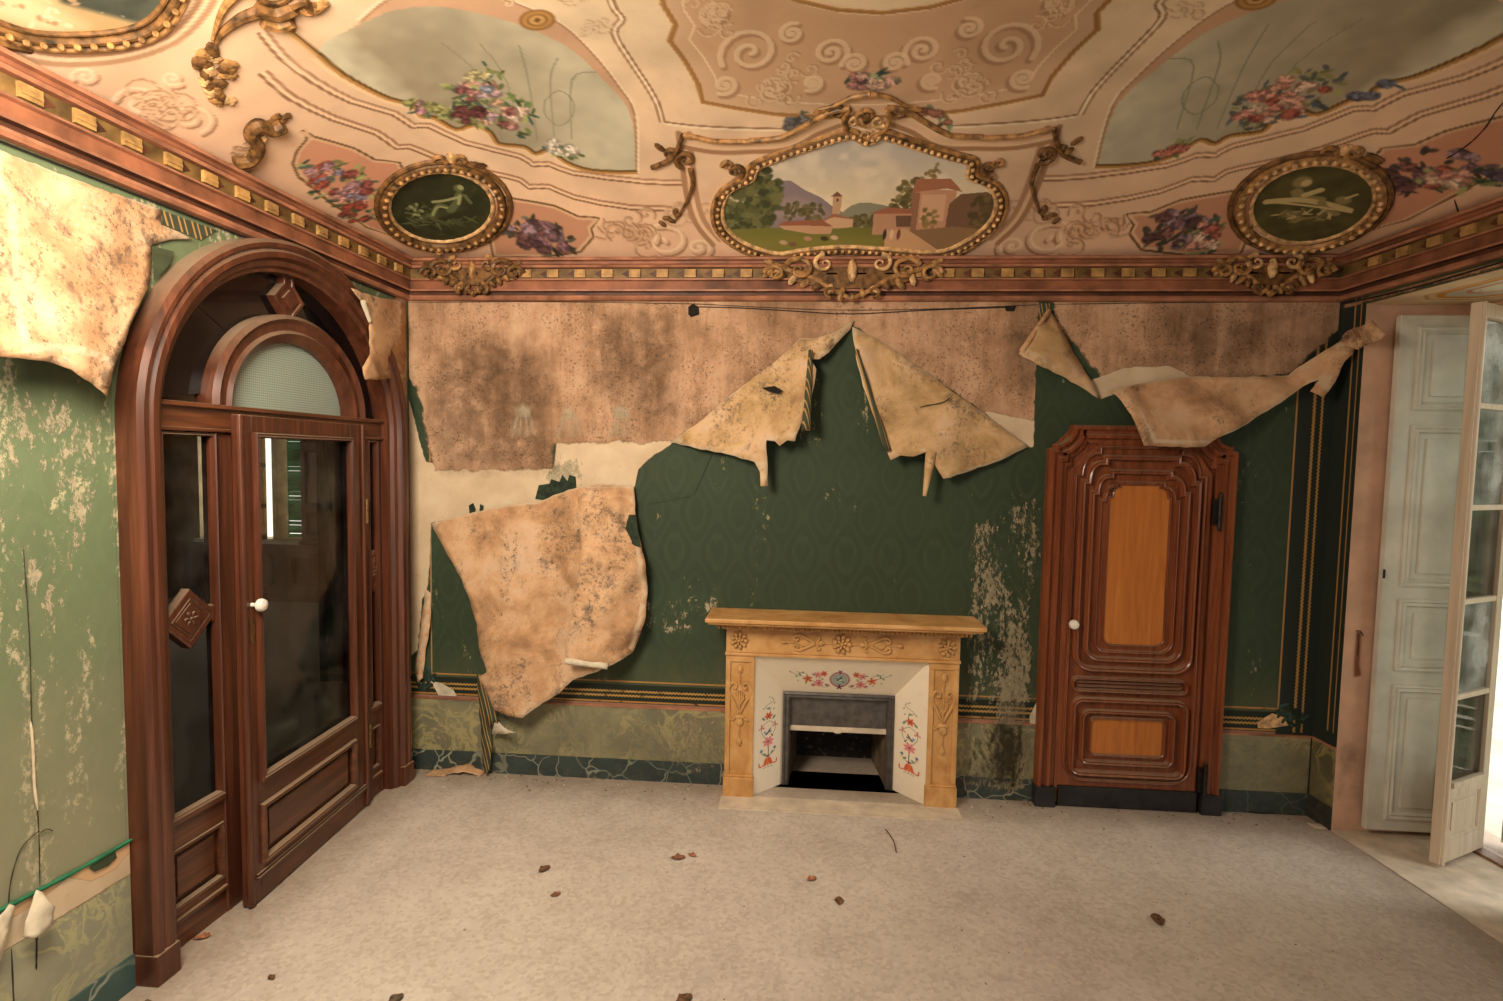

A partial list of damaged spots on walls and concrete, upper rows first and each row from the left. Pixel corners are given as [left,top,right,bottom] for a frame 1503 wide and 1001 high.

flaking render [394,261,1503,683]